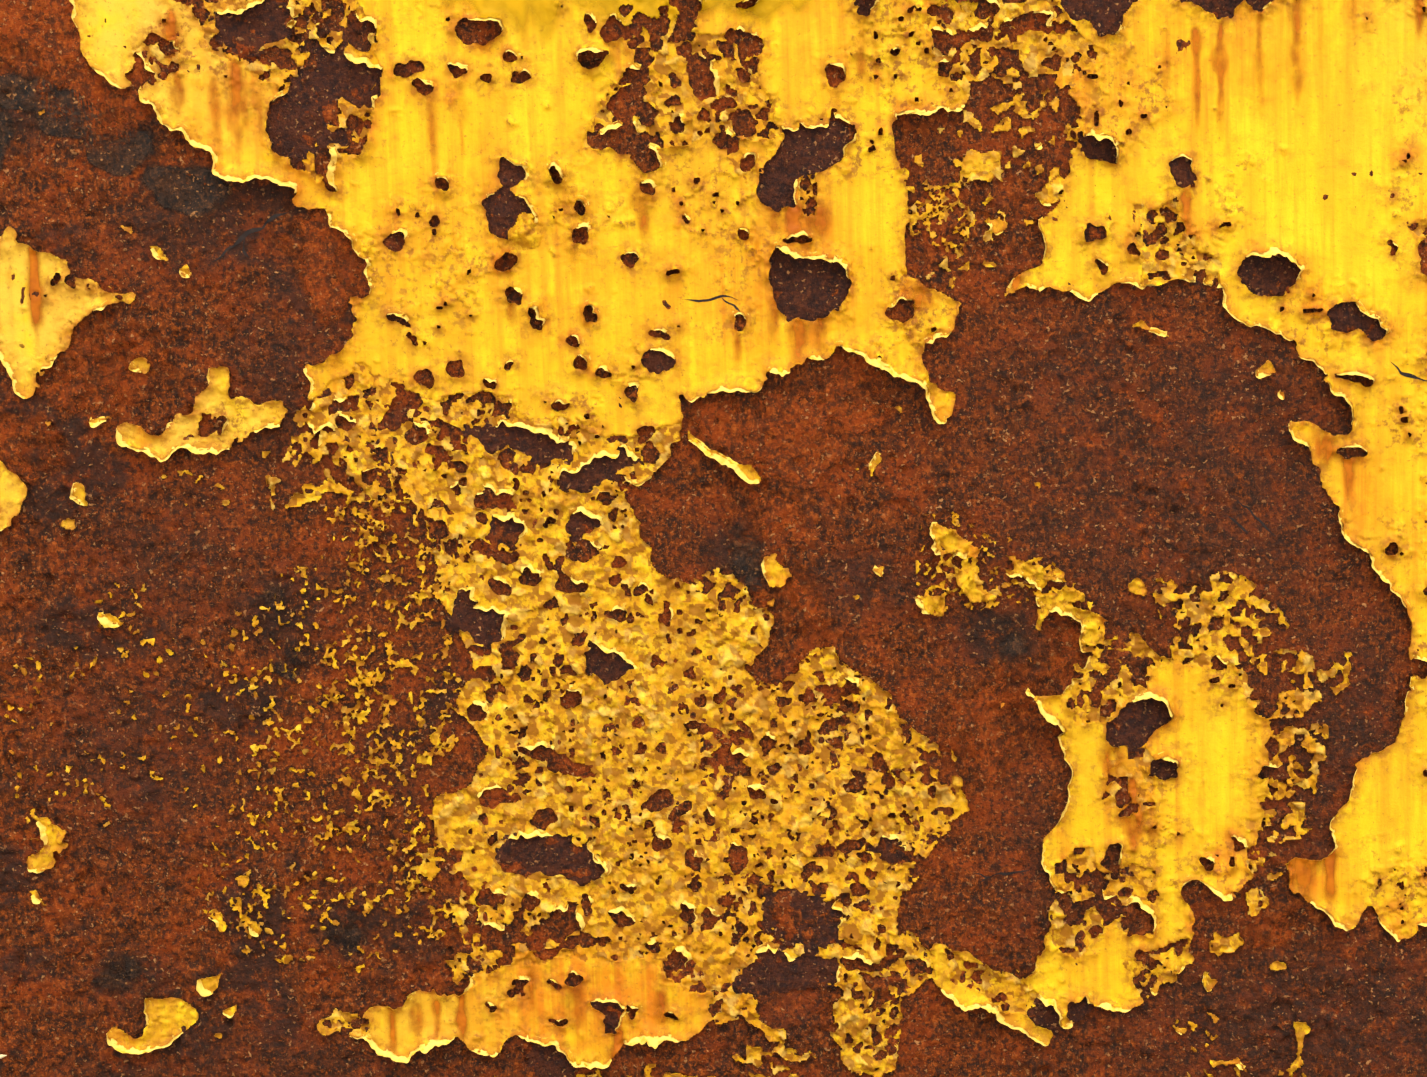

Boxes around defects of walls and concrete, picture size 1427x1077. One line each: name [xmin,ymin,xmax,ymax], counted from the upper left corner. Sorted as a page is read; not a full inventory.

rust [1058,0,1136,37]
rust [0,0,178,147]
rust [265,42,382,164]
rust [1321,302,1386,342]
peeling [688,431,761,484]
peeling [228,566,319,652]
peeling [344,507,411,588]
peeling [761,553,792,588]
rust [1104,698,1178,852]
peeling [1267,675,1427,942]
peeling [282,880,394,930]
rust [729,884,844,998]